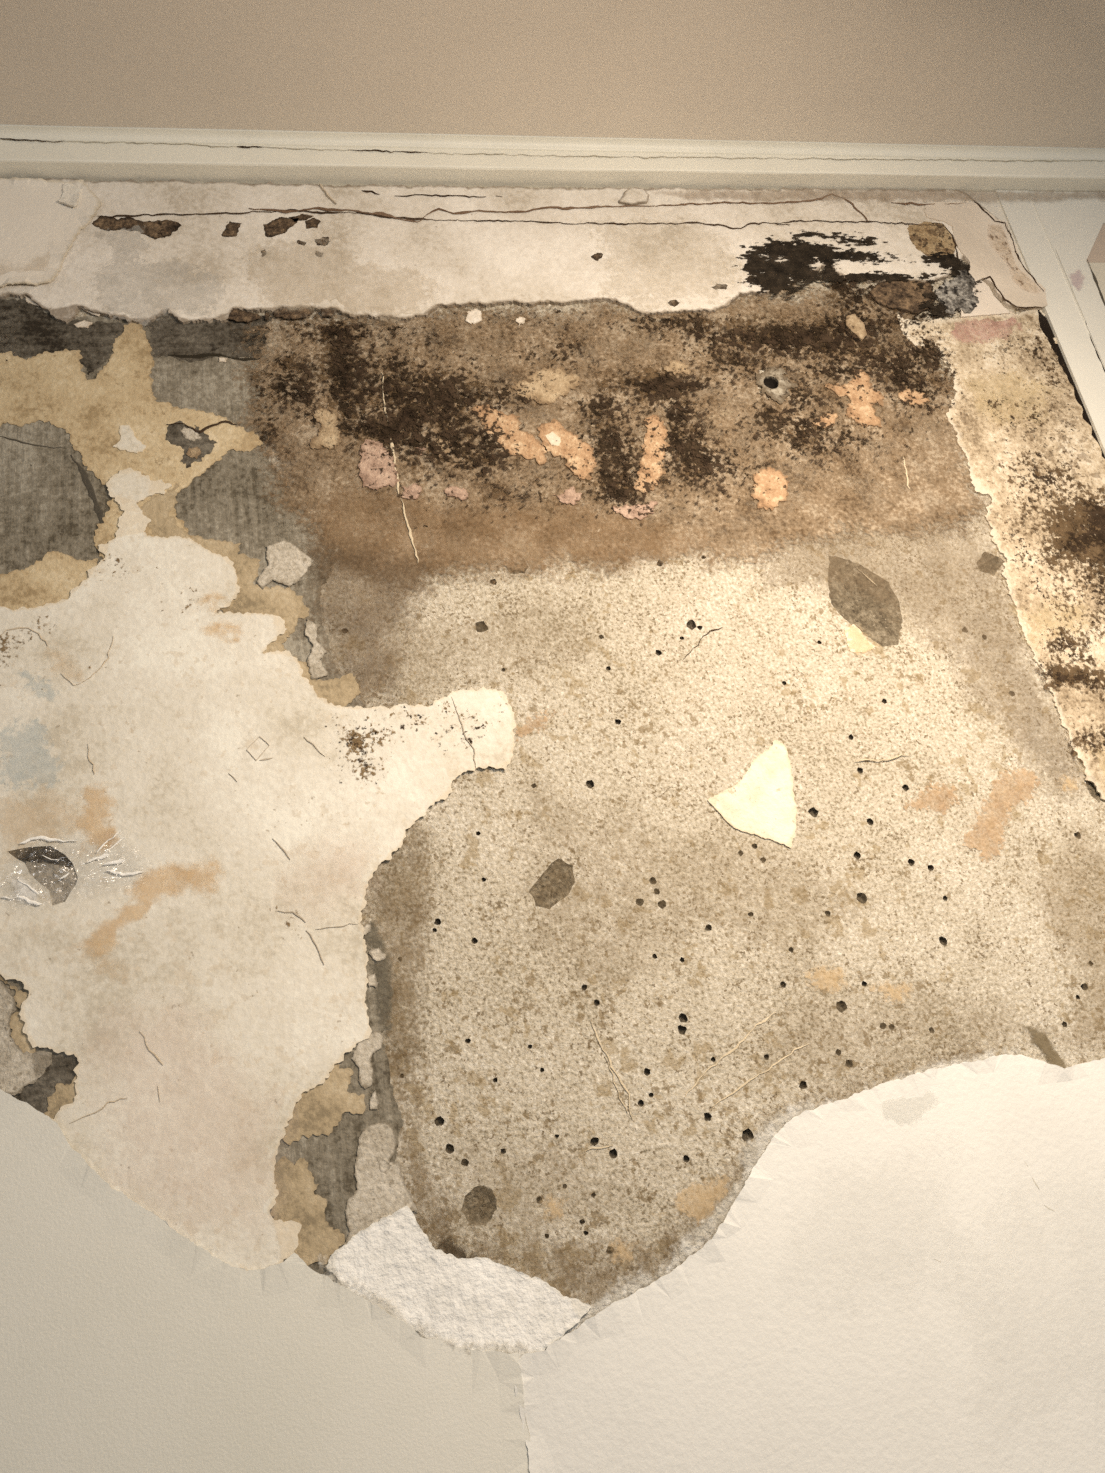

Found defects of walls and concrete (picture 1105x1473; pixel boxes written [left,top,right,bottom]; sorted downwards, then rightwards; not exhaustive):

crack [0,138,1098,309]
peeling [0,178,1048,1271]
water stain [233,229,1105,784]